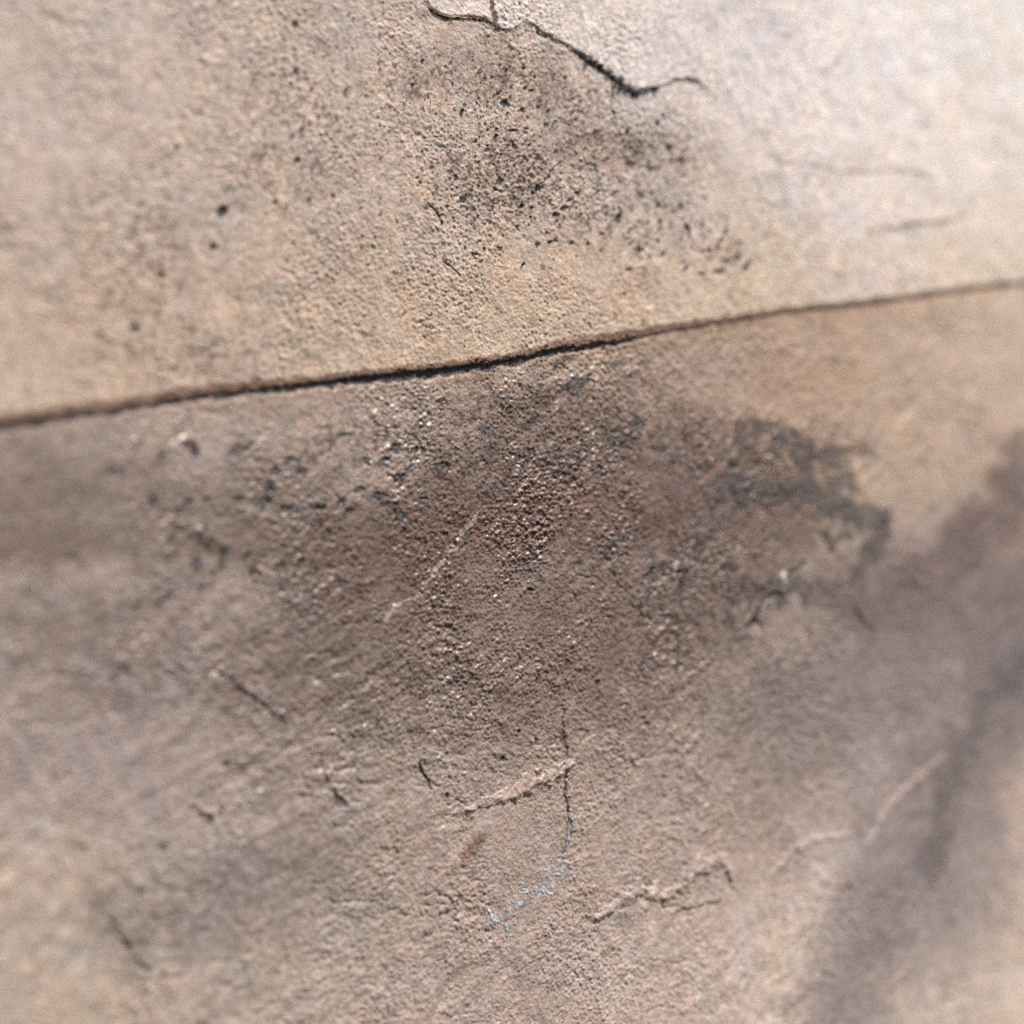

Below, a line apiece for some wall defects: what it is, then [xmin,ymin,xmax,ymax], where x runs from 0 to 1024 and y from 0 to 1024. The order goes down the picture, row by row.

crack [424,0,706,101]
crack [0,279,1024,432]
damp [186,389,1024,724]
crack [418,756,432,790]
crack [560,679,573,854]